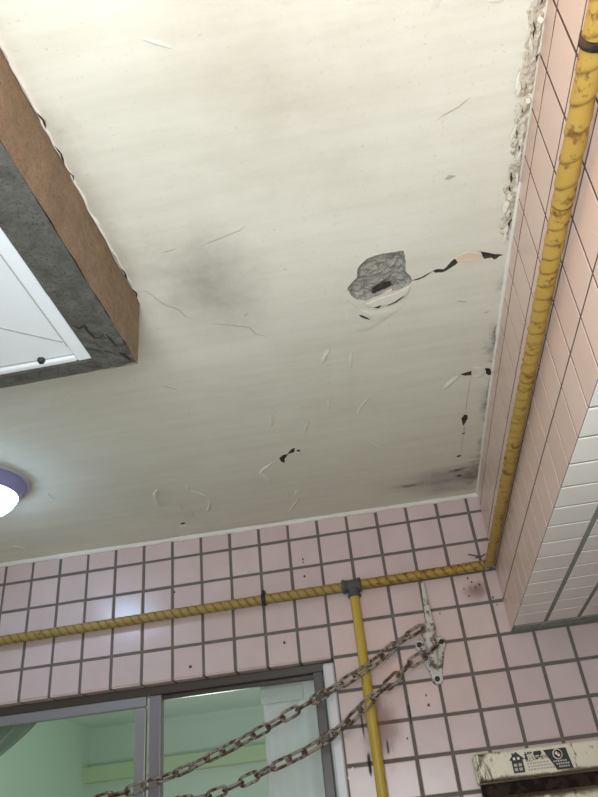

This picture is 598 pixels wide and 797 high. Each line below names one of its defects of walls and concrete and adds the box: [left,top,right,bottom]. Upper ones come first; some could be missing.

peeling [499,0,546,243]
crack [412,251,502,281]
spalling [343,251,412,332]
crack [443,367,491,414]
peeling [260,448,300,490]